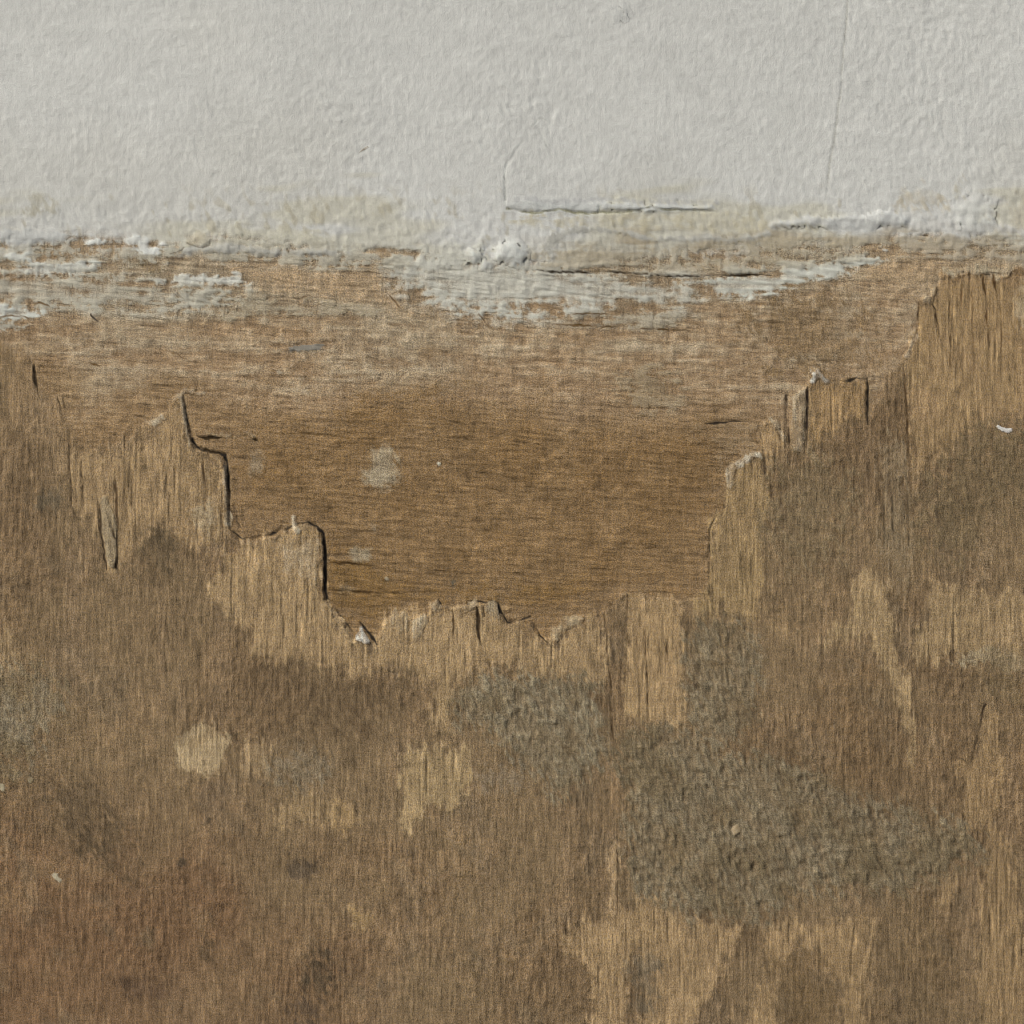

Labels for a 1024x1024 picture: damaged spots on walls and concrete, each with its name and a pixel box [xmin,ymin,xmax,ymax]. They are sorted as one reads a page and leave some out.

crack [502,116,718,216]
peeling [0,225,1024,647]